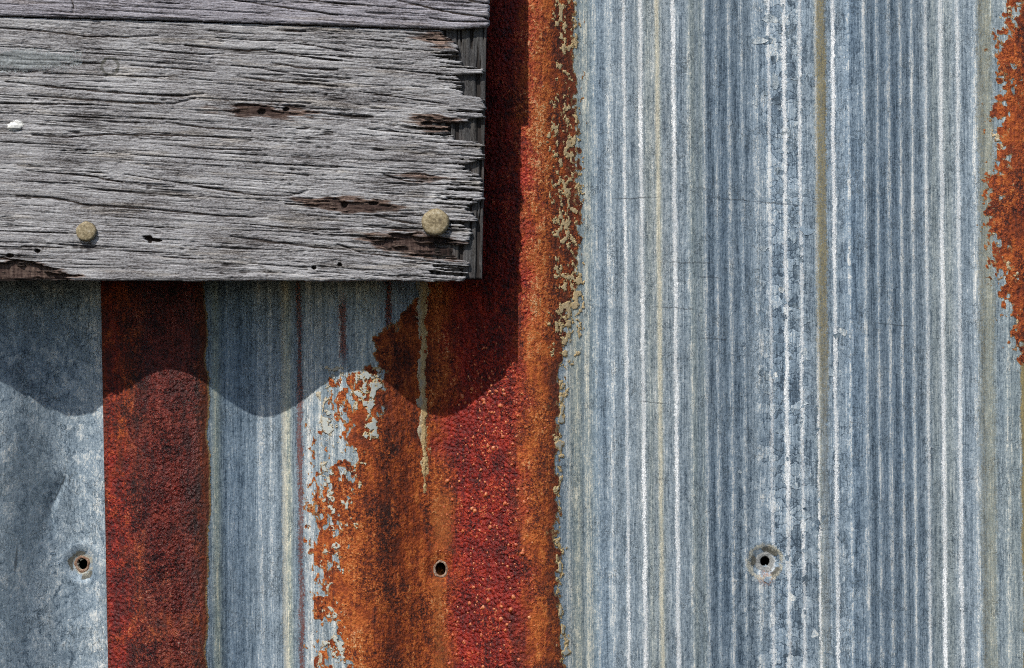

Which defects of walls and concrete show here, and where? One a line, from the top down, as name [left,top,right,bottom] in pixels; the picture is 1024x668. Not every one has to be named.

corrosion [101,281,211,668]
peeling [317,632,348,668]
peeling [316,365,383,619]
corrosion [296,0,588,668]
corrosion [977,0,1024,366]